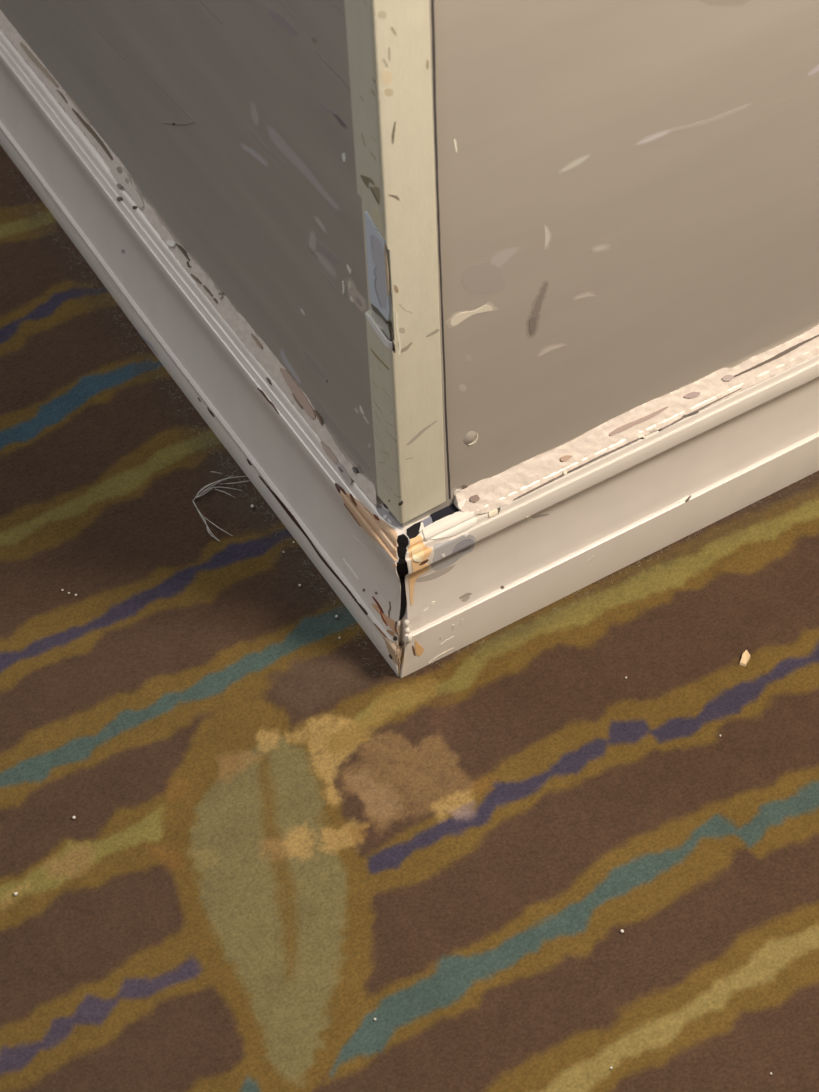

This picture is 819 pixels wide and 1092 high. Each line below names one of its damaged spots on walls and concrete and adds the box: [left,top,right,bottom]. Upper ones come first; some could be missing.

peeling [376,503,404,551]
peeling [419,488,477,541]
crack [247,459,409,668]